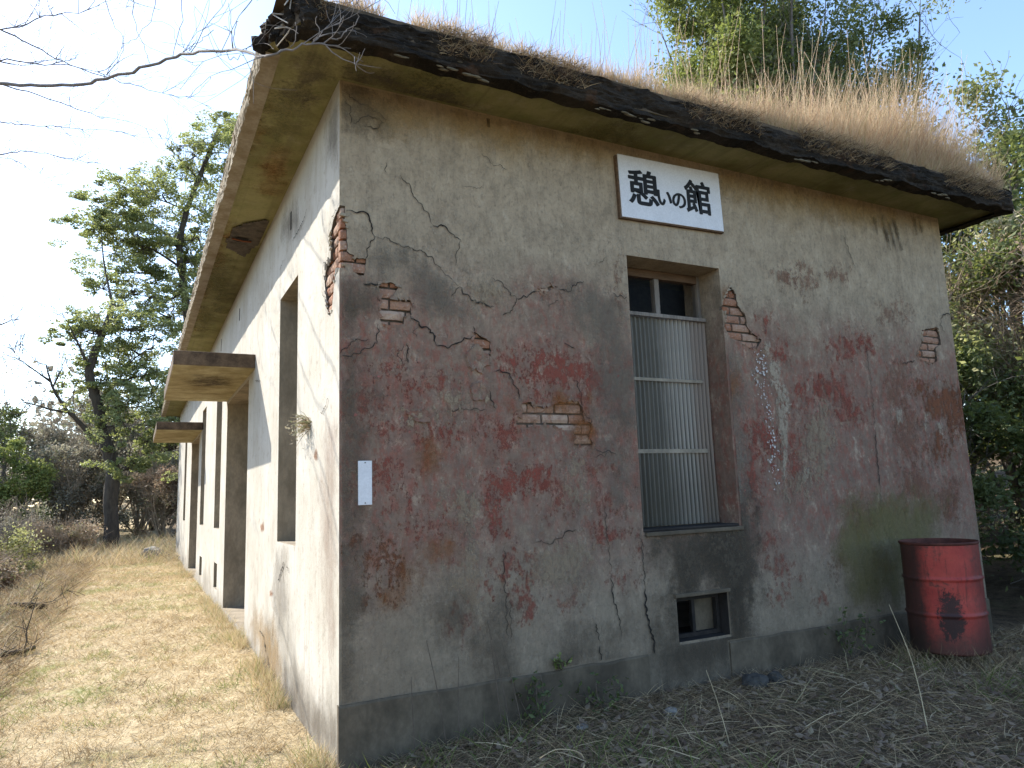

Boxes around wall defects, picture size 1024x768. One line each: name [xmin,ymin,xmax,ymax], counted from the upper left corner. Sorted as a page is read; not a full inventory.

spalling [225,220,269,257]
spalling [323,208,365,315]
spalling [377,280,414,329]
crack [322,163,584,362]
crack [447,369,520,412]
spalling [341,330,641,635]
peeling [722,286,876,608]
peeling [909,326,966,468]
crack [502,548,512,639]
crack [596,509,622,660]
crack [639,537,656,653]